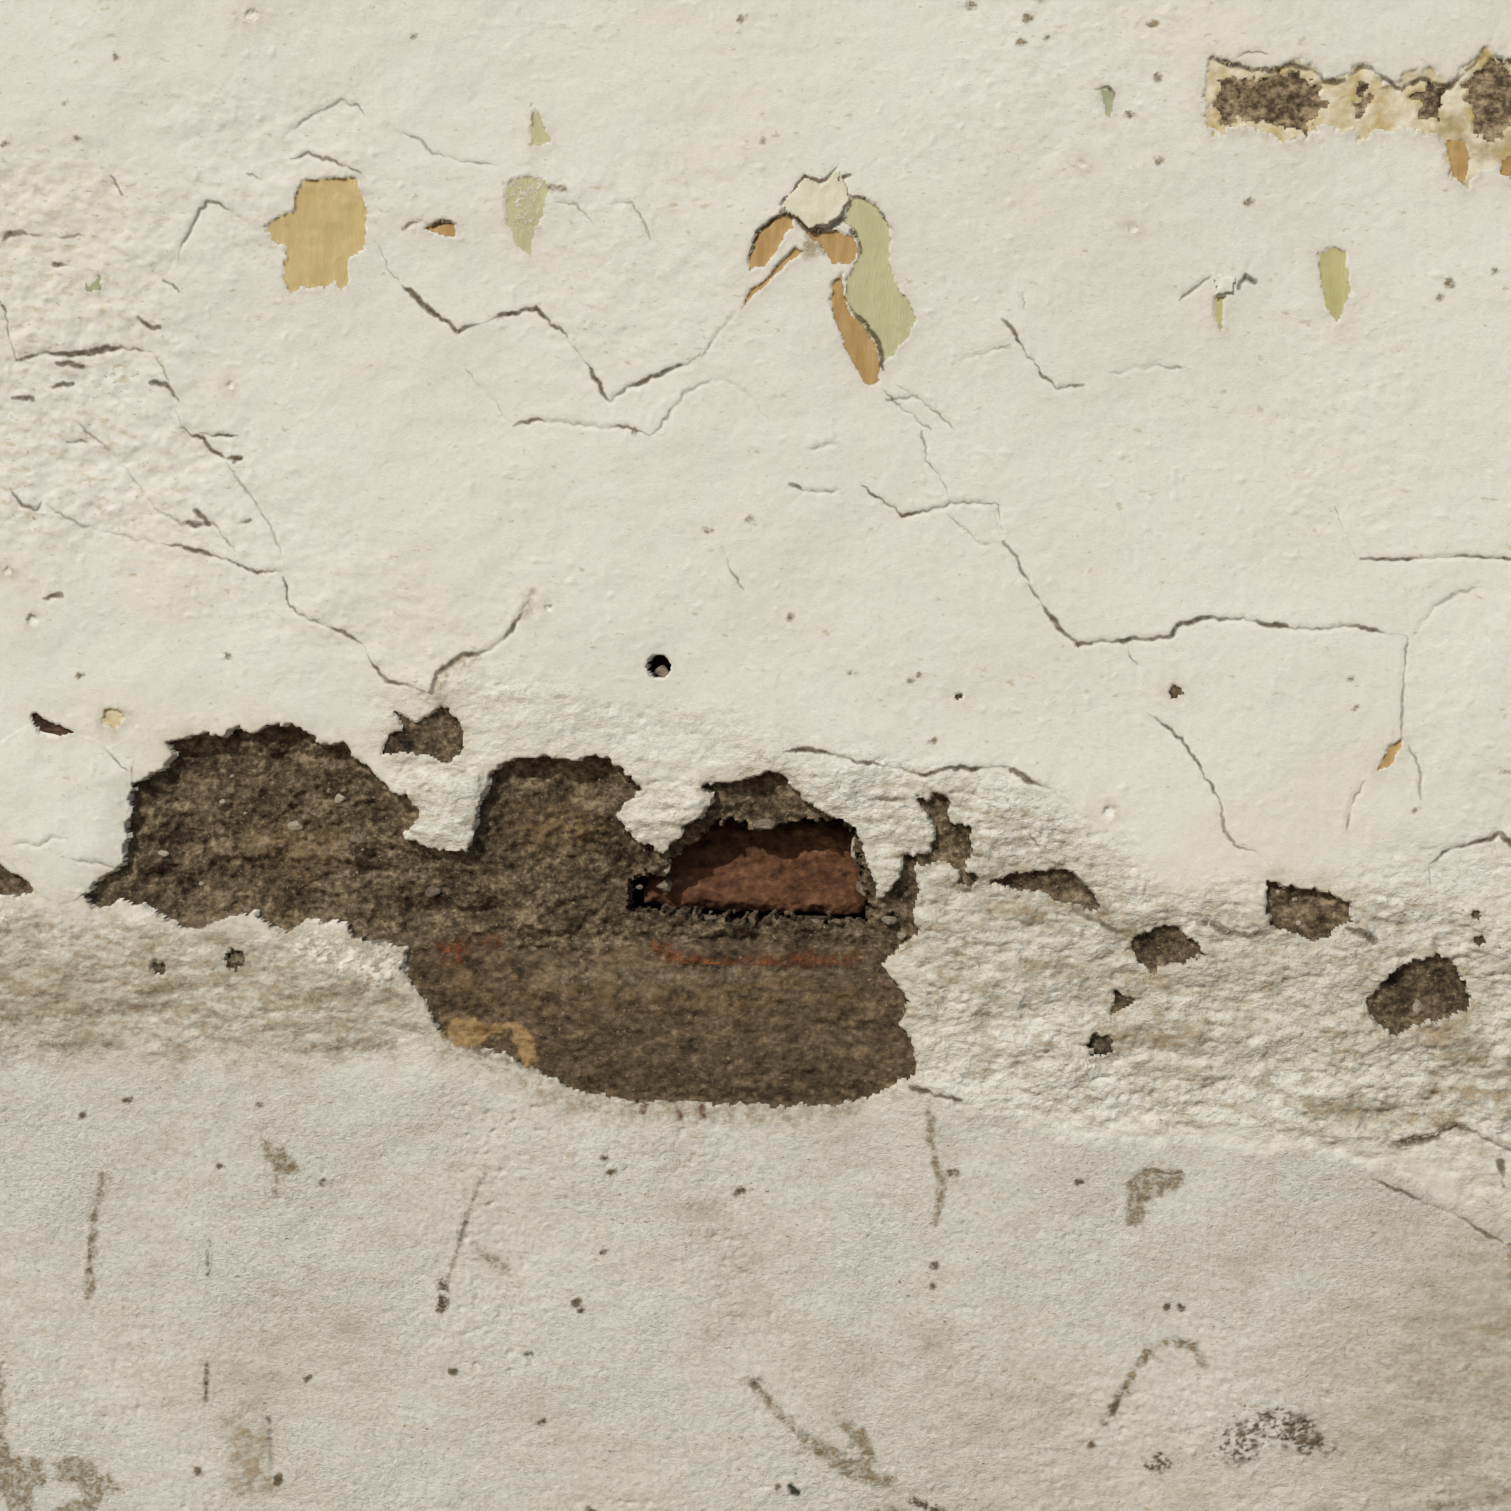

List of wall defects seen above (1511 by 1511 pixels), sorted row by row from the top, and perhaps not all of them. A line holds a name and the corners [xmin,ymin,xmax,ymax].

peeling [1203,46,1511,189]
crack [405,288,563,333]
peeling [741,169,916,386]
crack [16,321,160,401]
crack [590,364,682,431]
crack [192,433,243,461]
crack [1044,608,1287,647]
crack [919,765,1034,783]
spalling [0,707,1100,1109]
spalling [1266,881,1353,941]
spalling [1131,925,1204,976]
spalling [1366,953,1471,1036]